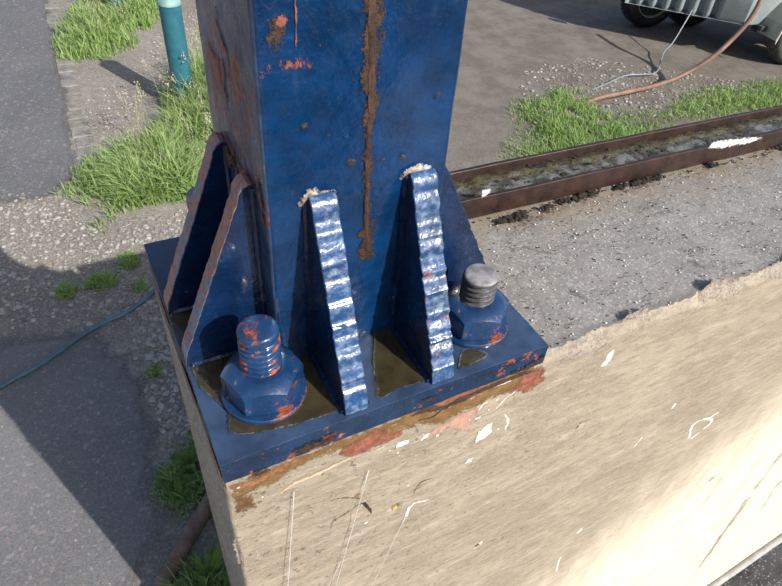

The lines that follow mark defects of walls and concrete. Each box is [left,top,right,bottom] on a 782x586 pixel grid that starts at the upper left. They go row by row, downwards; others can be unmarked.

corrosion [265,15,288,52]
corrosion [357,0,386,260]
spalling [761,261,782,278]
spalling [698,277,748,303]
corrosion [152,276,545,500]